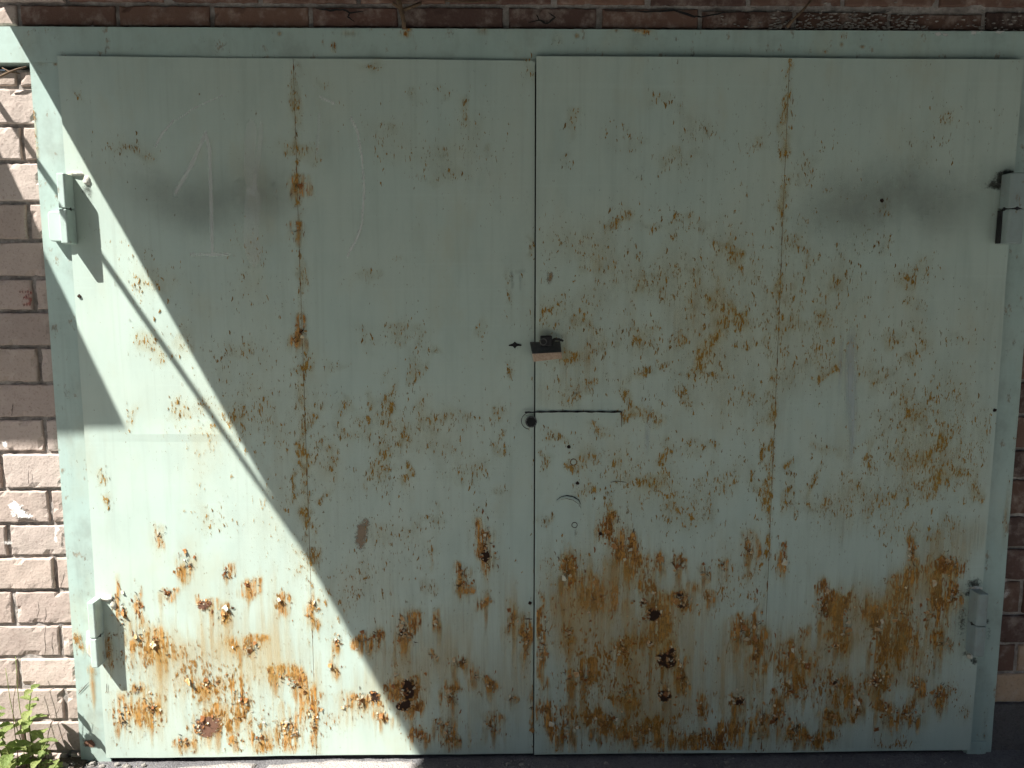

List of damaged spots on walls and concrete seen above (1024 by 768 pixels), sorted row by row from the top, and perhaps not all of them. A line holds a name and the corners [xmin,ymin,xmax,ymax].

rust [110,240,192,364]
rust [159,59,995,752]
peeling [192,715,222,741]
rust [91,582,343,755]